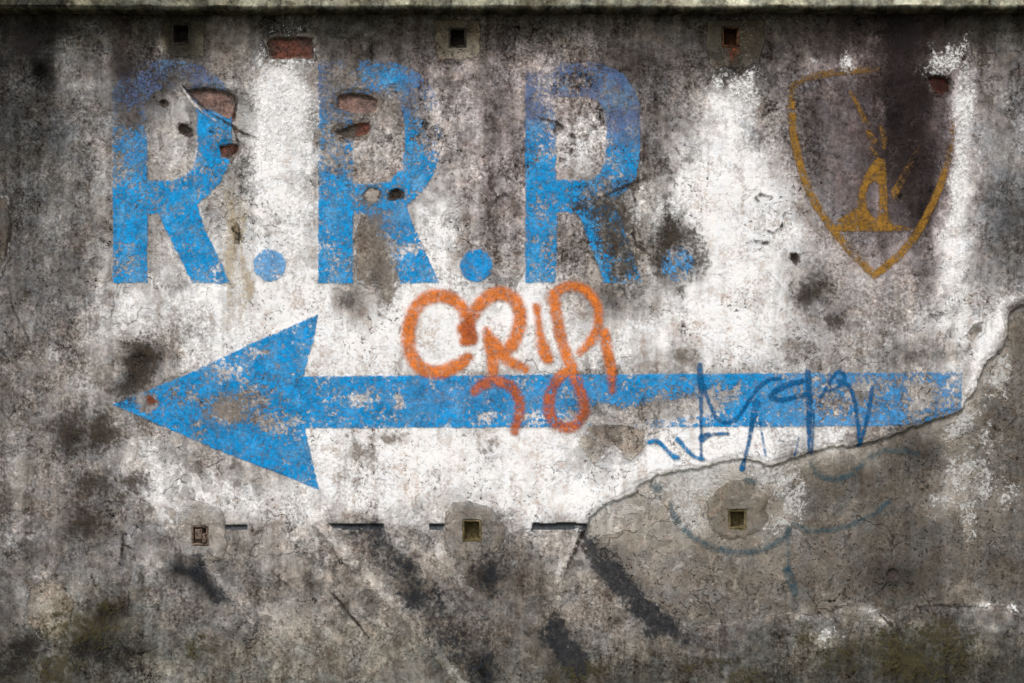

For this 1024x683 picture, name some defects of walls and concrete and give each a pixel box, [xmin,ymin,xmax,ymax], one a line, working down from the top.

spalling [263,32,317,64]
spalling [176,122,194,137]
spalling [182,84,238,122]
crack [180,85,255,151]
spalling [208,130,245,163]
spalling [331,88,384,143]
spalling [926,74,955,99]
water stain [924,39,976,303]
spalling [577,301,1024,629]
water stain [577,525,696,648]
water stain [524,611,588,680]